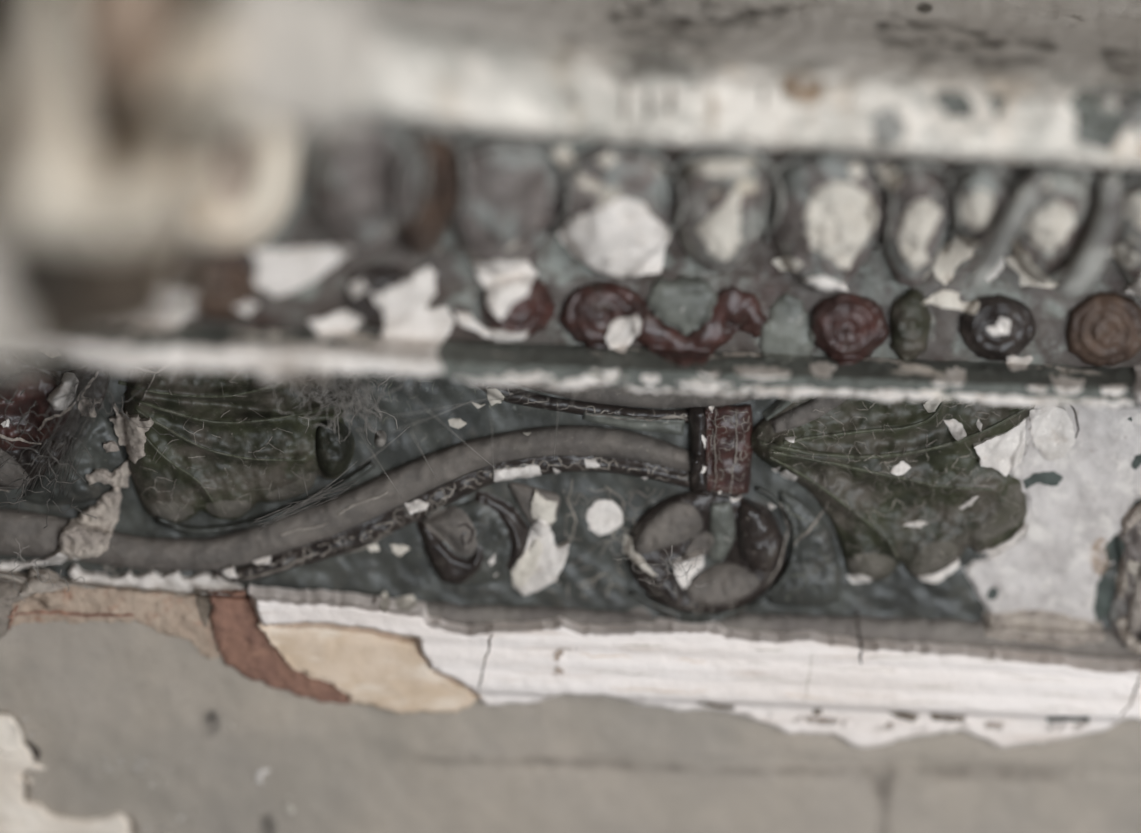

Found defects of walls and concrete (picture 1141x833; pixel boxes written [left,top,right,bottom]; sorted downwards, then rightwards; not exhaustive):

peeling [235,244,355,316]
peeling [557,197,671,277]
peeling [696,191,743,262]
peeling [772,161,902,291]
peeling [898,188,995,314]
peeling [987,177,1076,288]
spalling [45,260,1141,654]
spalling [0,549,481,714]
crack [479,623,493,690]
crack [855,608,863,664]
crack [1120,675,1141,716]
peeling [0,711,137,833]